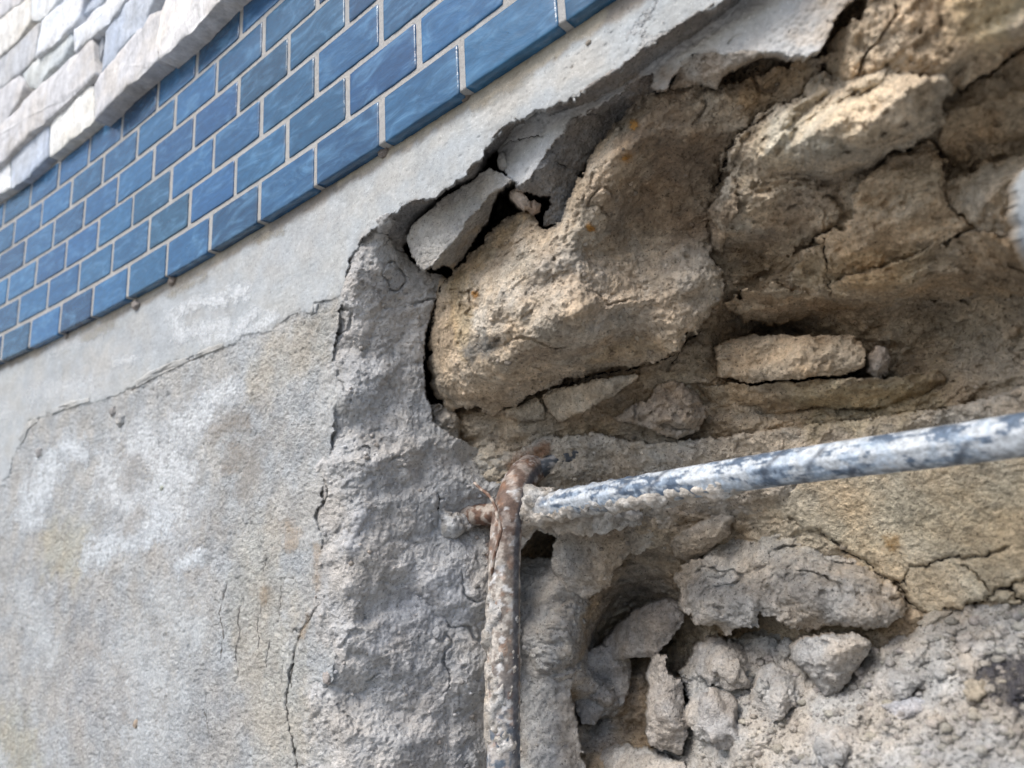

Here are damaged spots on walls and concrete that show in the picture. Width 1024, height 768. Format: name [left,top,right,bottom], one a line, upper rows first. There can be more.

crack [714,109,773,190]
peeling [136,343,225,388]
spalling [295,0,1024,768]
crack [823,534,1024,609]